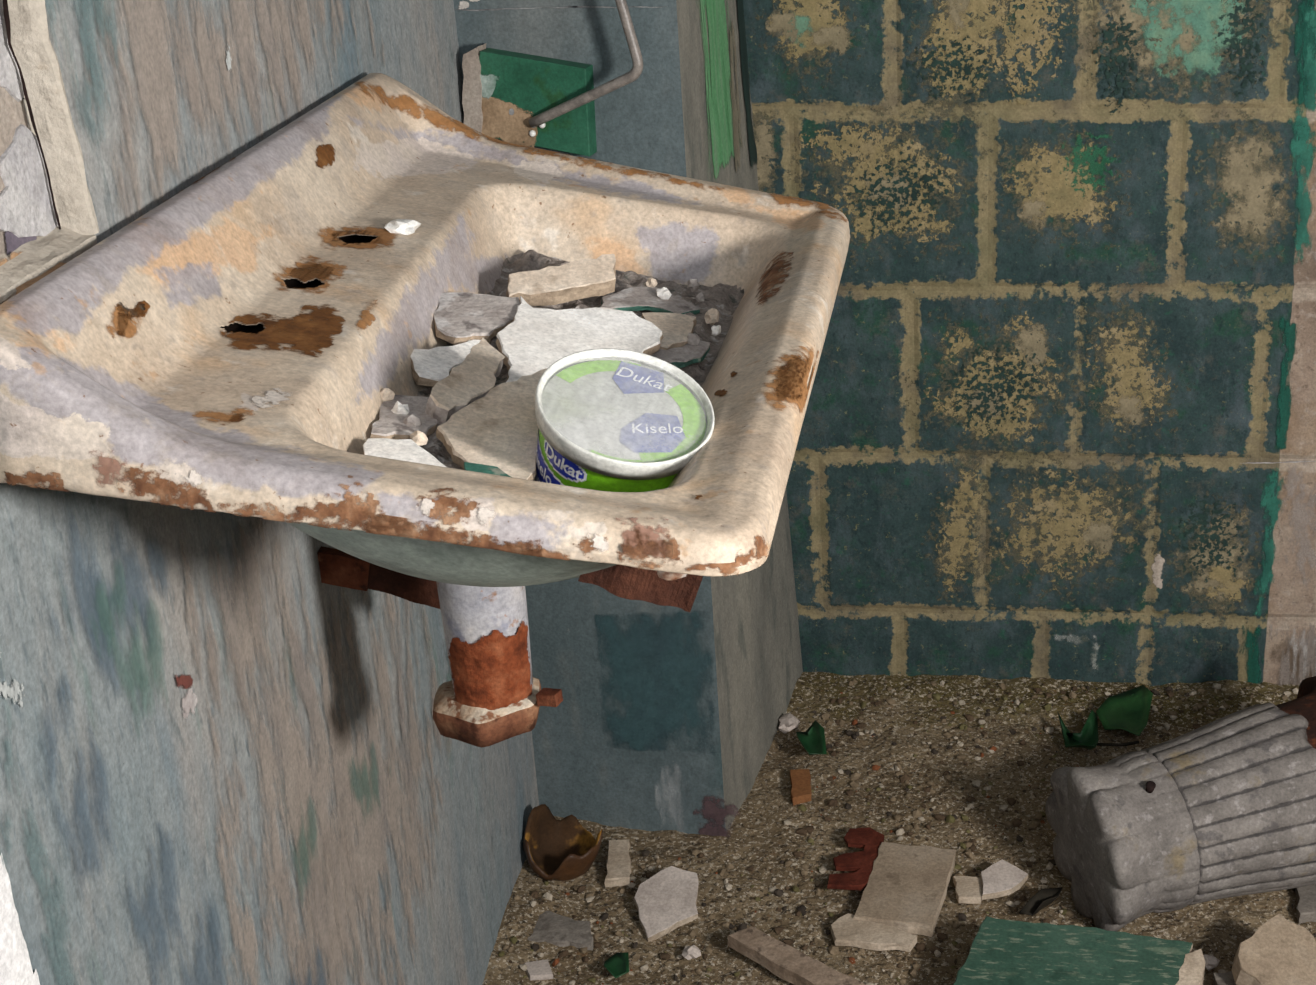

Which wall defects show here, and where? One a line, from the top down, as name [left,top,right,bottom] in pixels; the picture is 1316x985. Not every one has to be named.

crack [3,0,61,229]
peeling [753,0,1297,271]
peeling [905,289,1265,629]
peeling [0,679,25,707]
water stain [1273,625,1316,685]
peeling [0,853,40,985]